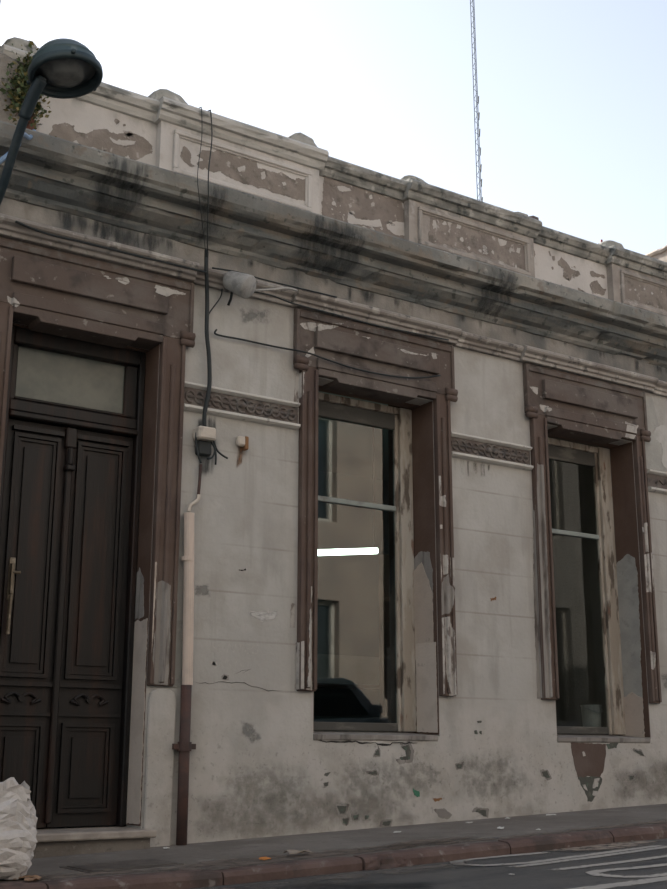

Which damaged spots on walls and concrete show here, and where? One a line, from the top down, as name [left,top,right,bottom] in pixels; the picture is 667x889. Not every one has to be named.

peeling [49,119,153,160]
damp [63,215,156,246]
damp [98,159,143,217]
peeling [180,146,305,201]
damp [303,218,364,276]
peeling [321,177,404,239]
peeling [428,218,535,270]
peeling [549,251,606,295]
peeling [414,551,457,733]
peeling [606,523,656,749]
peeling [126,562,171,824]
spalling [396,741,414,764]